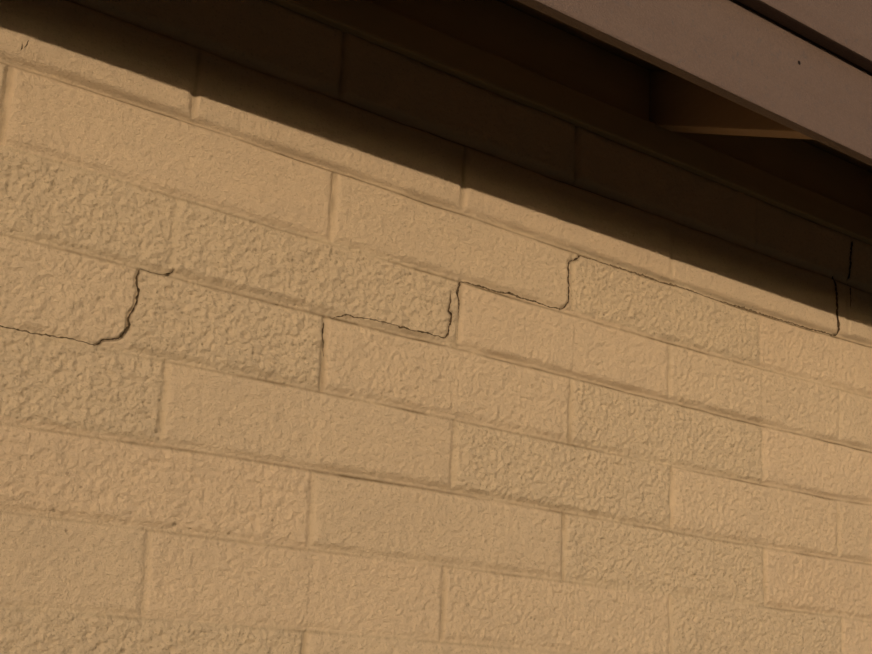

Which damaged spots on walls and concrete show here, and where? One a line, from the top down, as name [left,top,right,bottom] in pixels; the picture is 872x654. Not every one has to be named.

crack [0,270,173,345]
crack [322,241,853,357]